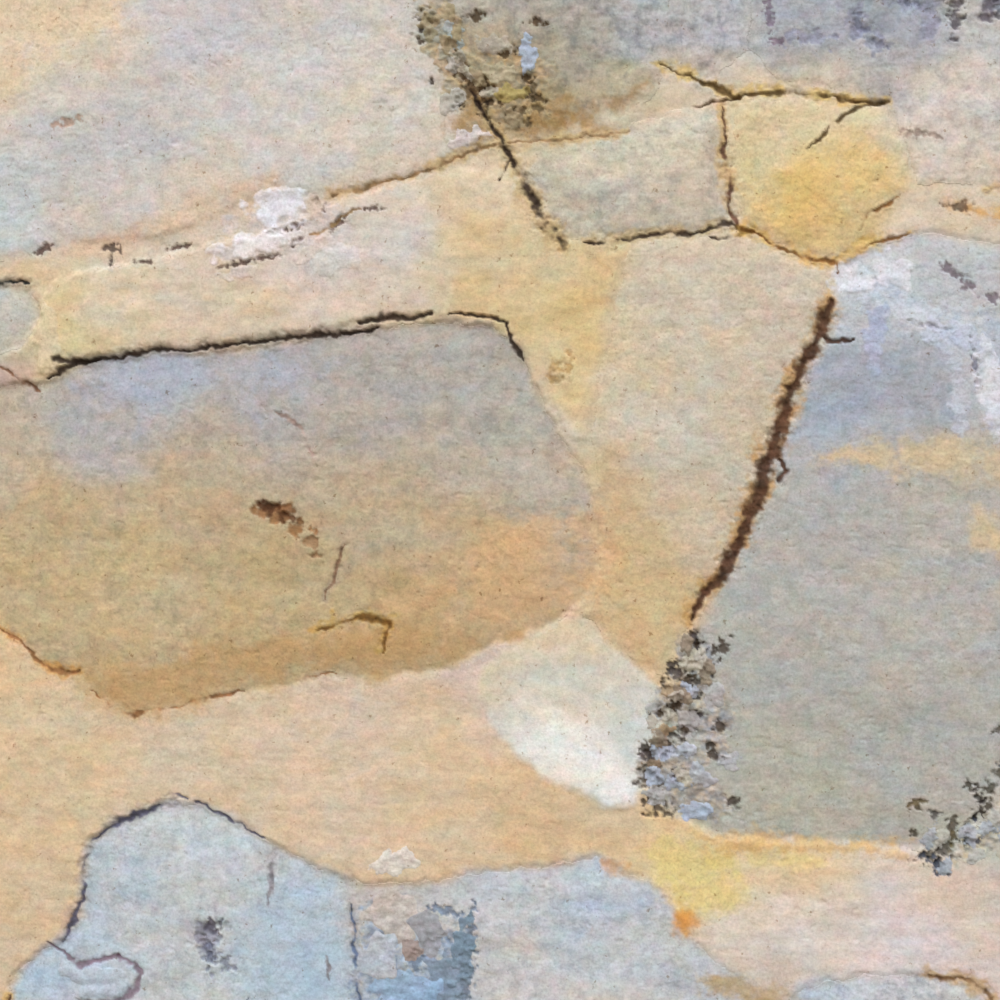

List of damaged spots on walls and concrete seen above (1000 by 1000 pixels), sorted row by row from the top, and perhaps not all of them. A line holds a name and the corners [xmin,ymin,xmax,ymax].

spalling [406,0,563,146]
crack [0,309,525,394]
crack [308,52,919,631]
spalling [630,625,746,826]
spalling [989,698,1000,736]
spalling [905,760,1000,878]